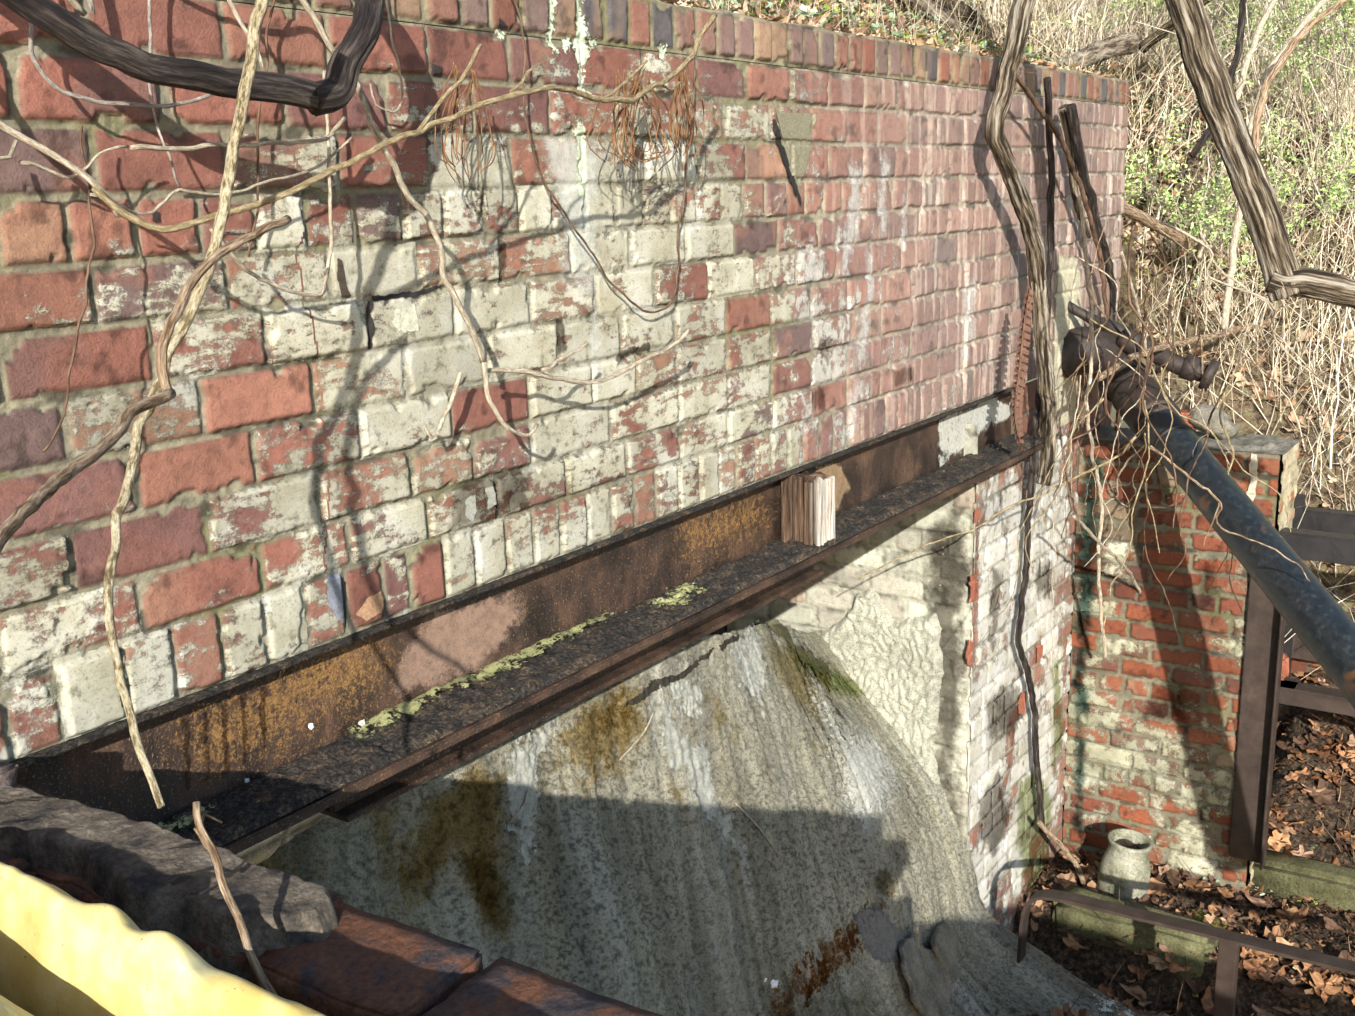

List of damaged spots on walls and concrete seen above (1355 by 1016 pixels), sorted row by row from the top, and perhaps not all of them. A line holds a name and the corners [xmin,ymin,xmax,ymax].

leakage [545,0,560,56]
peeling [0,53,908,763]
peeling [938,371,1011,467]
corrosion [815,463,850,510]
corrosion [664,492,765,578]
corrosion [176,591,524,782]
crack [626,634,740,706]
leakage [725,625,768,720]
peeling [966,424,1247,926]
leakage [504,726,552,879]
leakage [646,675,746,866]